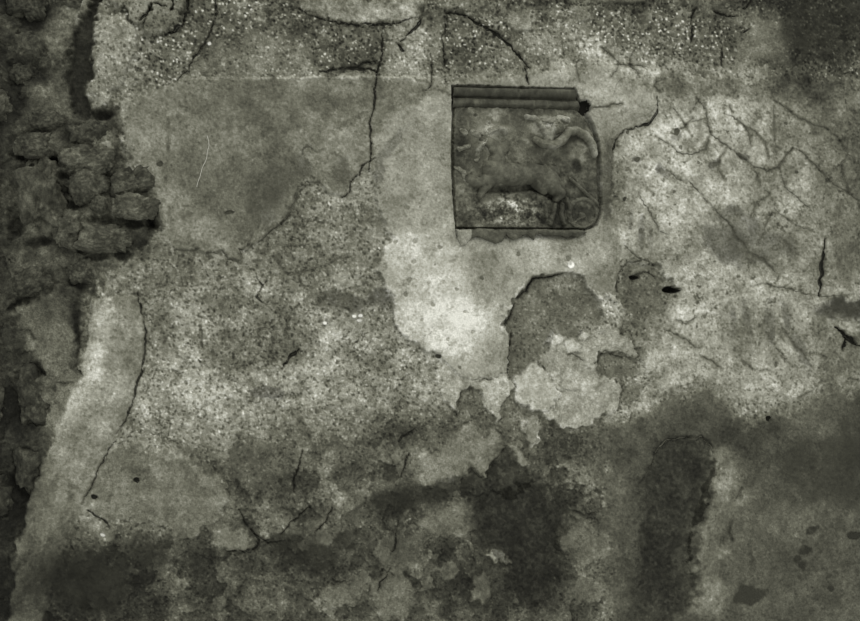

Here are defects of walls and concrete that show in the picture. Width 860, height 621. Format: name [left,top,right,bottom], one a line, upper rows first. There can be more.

crack [425,13,529,94]
crack [299,9,421,198]
crack [601,47,860,297]
flaking render [394,320,450,353]
spalling [456,263,679,445]
crack [834,327,860,348]
spalling [228,436,282,490]
flaking render [216,524,253,550]
flaking render [417,560,460,592]
flaking render [470,572,492,604]
spalling [474,447,580,612]
spalling [631,436,716,621]